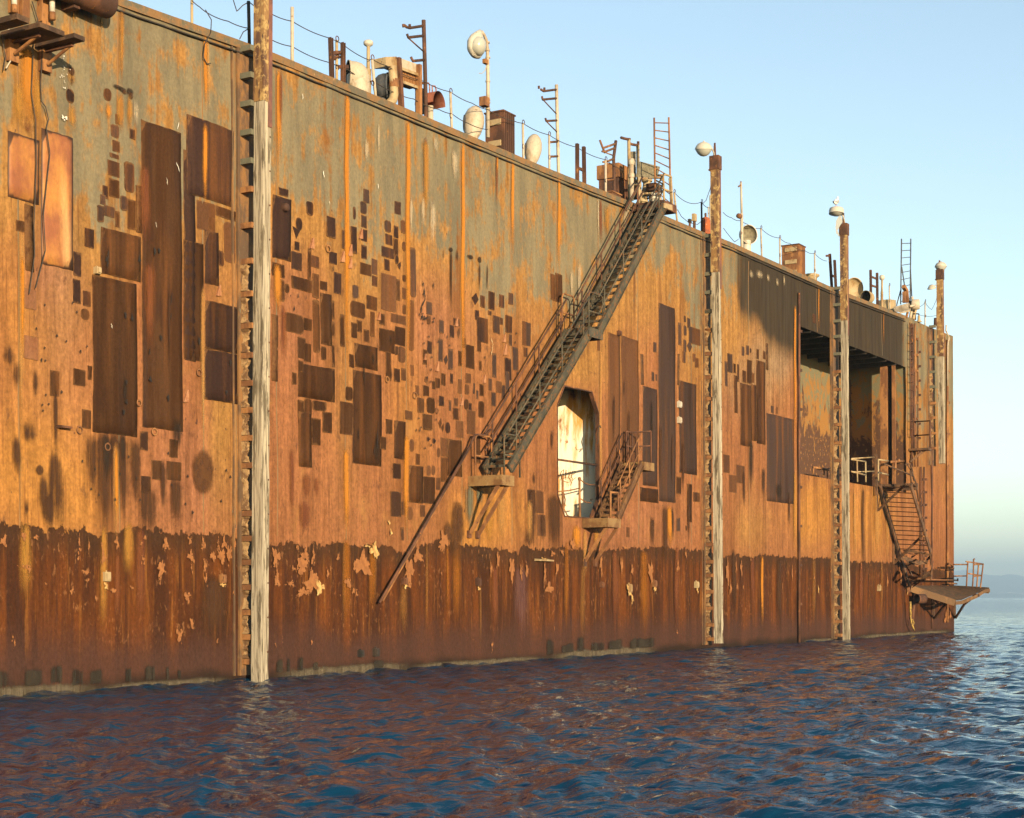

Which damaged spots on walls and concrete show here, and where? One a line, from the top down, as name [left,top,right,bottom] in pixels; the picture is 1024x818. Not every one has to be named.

rust [20,526,29,584]
rust [101,525,145,610]
damp [0,435,251,695]
peeling [157,537,169,584]
peeling [187,532,237,595]
peeling [272,542,340,597]
peeling [340,541,379,596]
rust [447,548,459,596]
rust [565,527,598,605]
rust [663,507,679,611]
rust [751,558,763,611]